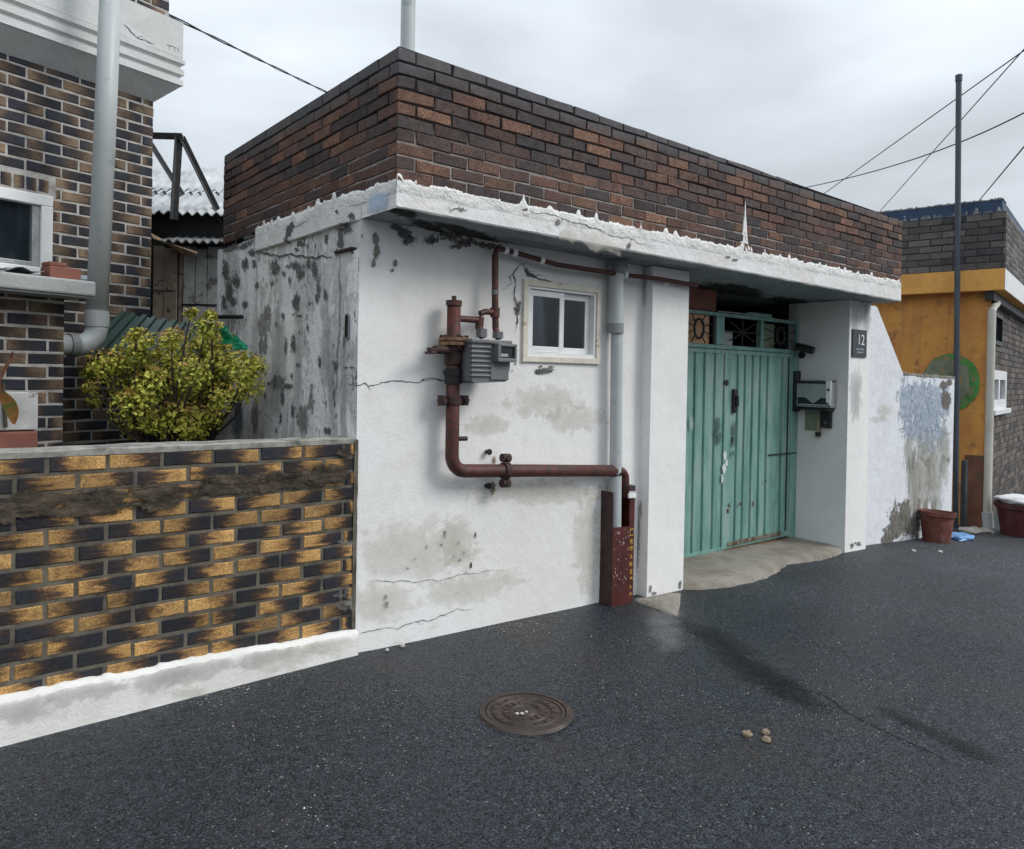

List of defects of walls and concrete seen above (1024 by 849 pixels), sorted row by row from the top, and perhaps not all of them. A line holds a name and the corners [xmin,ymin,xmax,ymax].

peeling [391,224,502,250]
crack [505,264,556,332]
crack [256,241,443,426]
damp [234,400,243,438]
peeling [714,417,738,483]
peeling [896,374,952,464]
spalling [0,446,351,525]
crack [362,608,472,633]